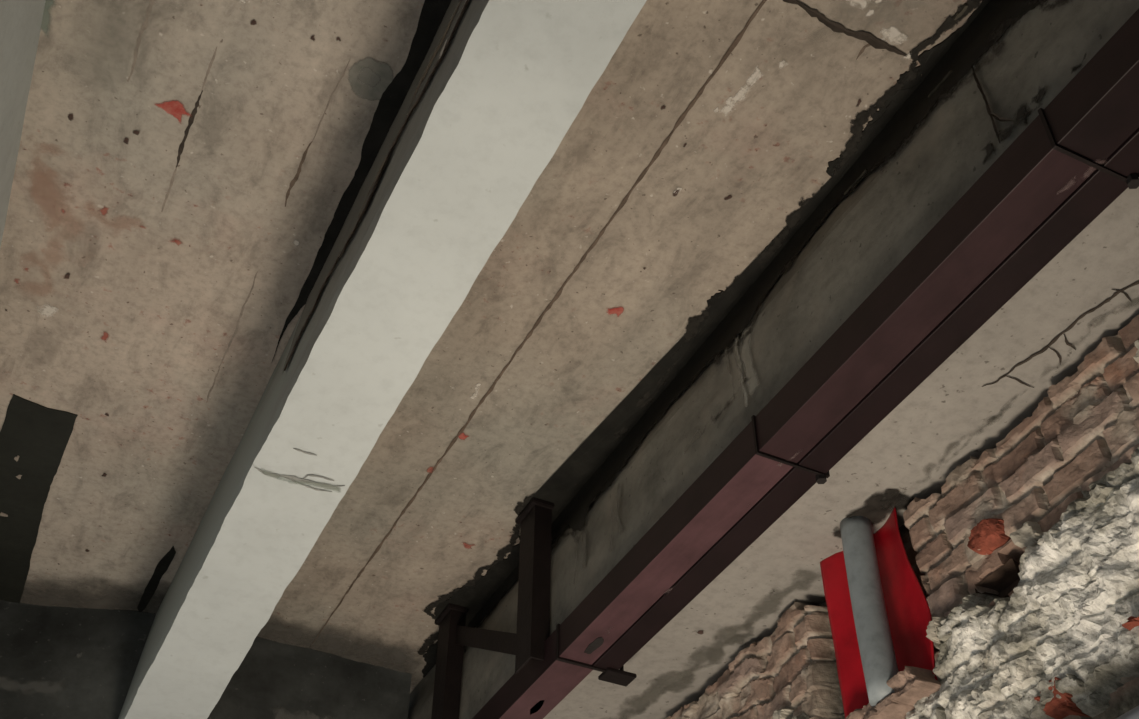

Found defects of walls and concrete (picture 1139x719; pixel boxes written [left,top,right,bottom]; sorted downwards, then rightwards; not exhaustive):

crack [161,47,217,212]
crack [285,59,350,207]
damp [349,58,393,101]
flaking render [283,0,469,371]
crack [309,0,907,648]
crack [982,281,1139,388]
crack [254,467,345,492]
spalling [846,489,914,526]
flaking render [906,447,1139,719]
flaking render [773,708,810,719]